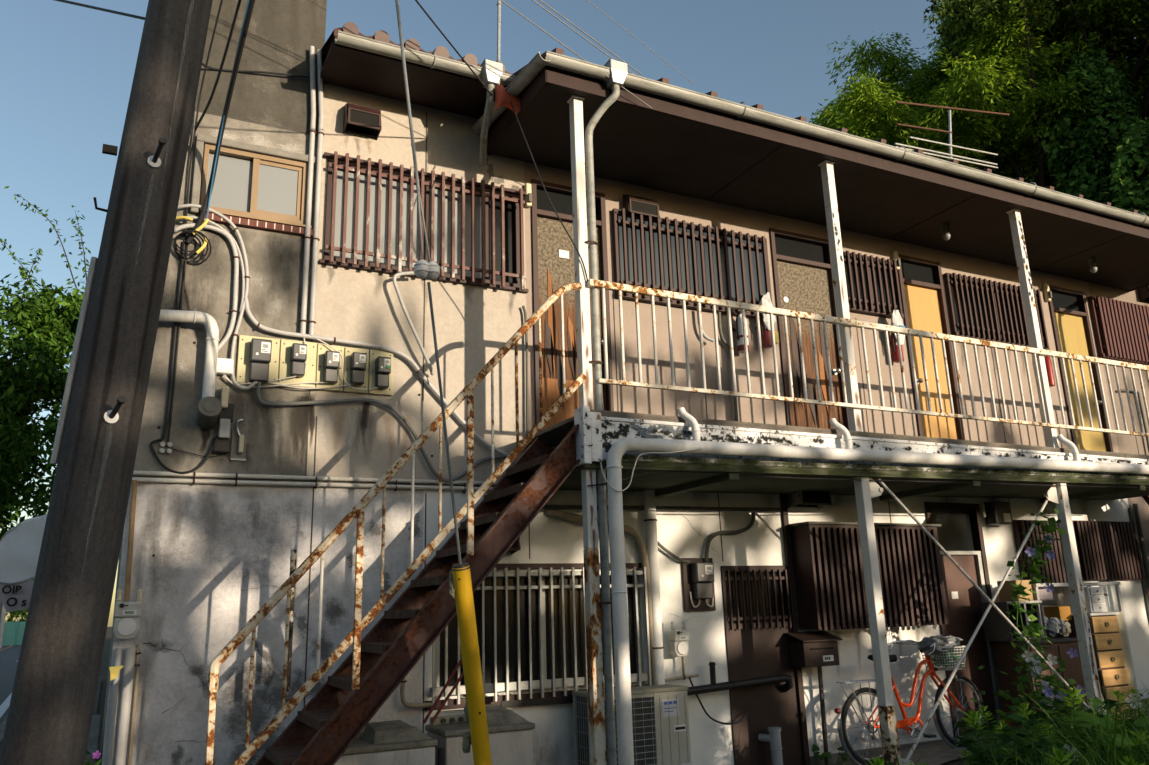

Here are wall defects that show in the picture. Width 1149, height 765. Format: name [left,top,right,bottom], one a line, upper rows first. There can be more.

leakage [348,402,370,446]
peeling [585,412,828,452]
leakage [326,602,343,621]
leakage [316,638,333,659]
crack [143,634,224,714]
leakage [192,666,208,689]
leakage [228,638,323,765]